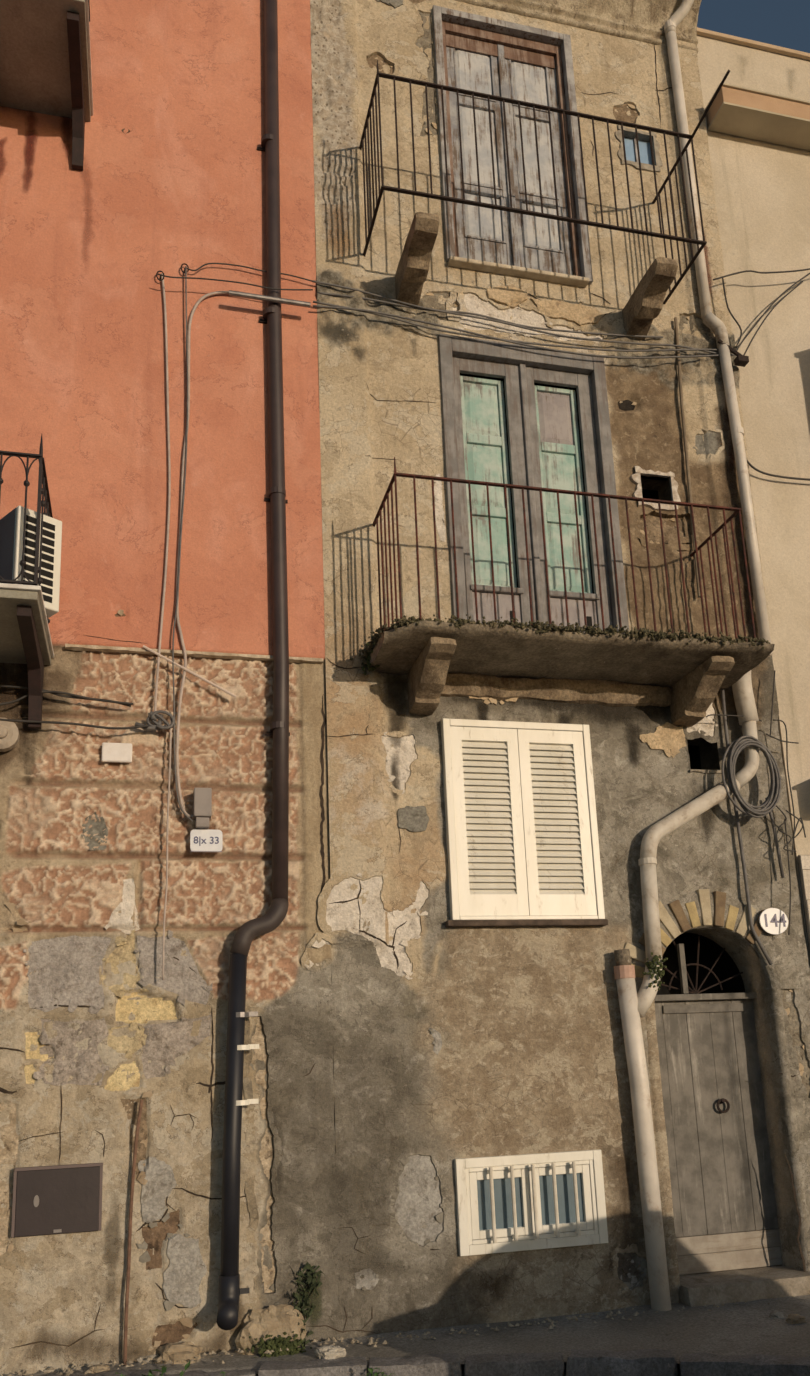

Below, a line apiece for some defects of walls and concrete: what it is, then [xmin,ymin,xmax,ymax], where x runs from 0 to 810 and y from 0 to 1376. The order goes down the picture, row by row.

rust [25,115,35,186]
peeling [416,284,609,349]
peeling [639,697,722,758]
crack [319,657,407,973]
peeling [301,868,437,984]
spalling [0,879,213,1185]
crack [170,1009,225,1141]
crack [136,1188,246,1232]
spalling [387,1145,452,1256]